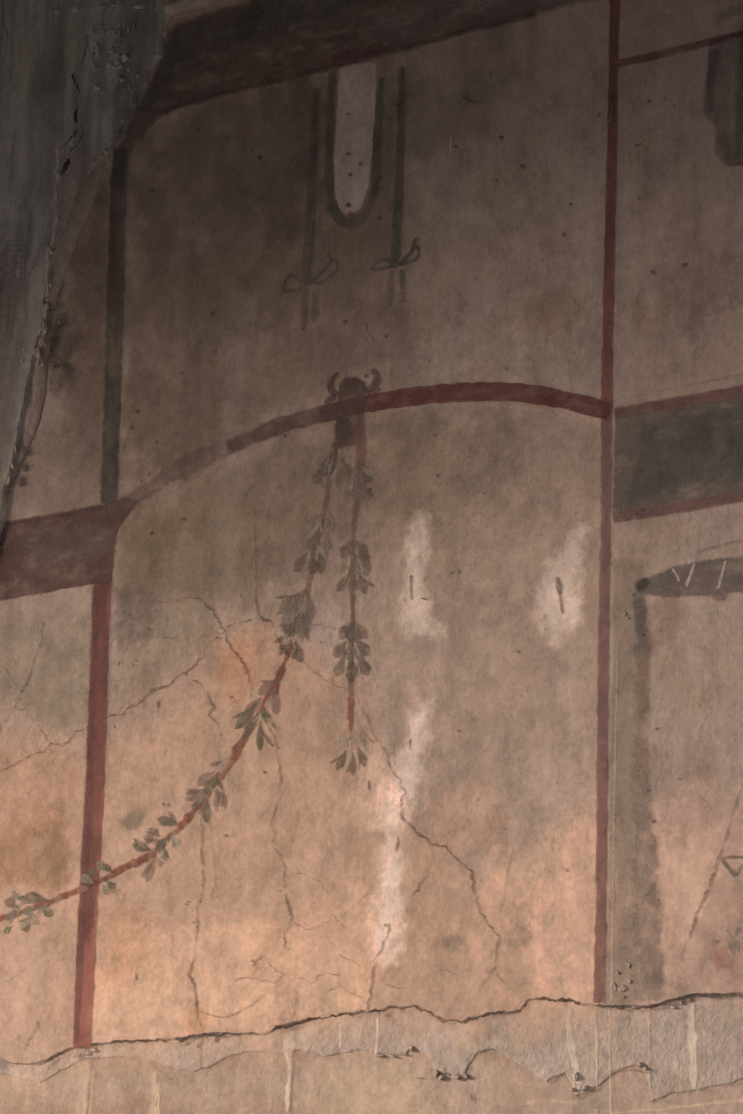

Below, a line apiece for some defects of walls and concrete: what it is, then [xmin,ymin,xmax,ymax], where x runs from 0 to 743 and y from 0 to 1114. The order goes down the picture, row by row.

damp [0,432,743,1114]
crack [0,527,743,1079]
crack [416,1048,498,1102]
crack [546,1068,743,1102]